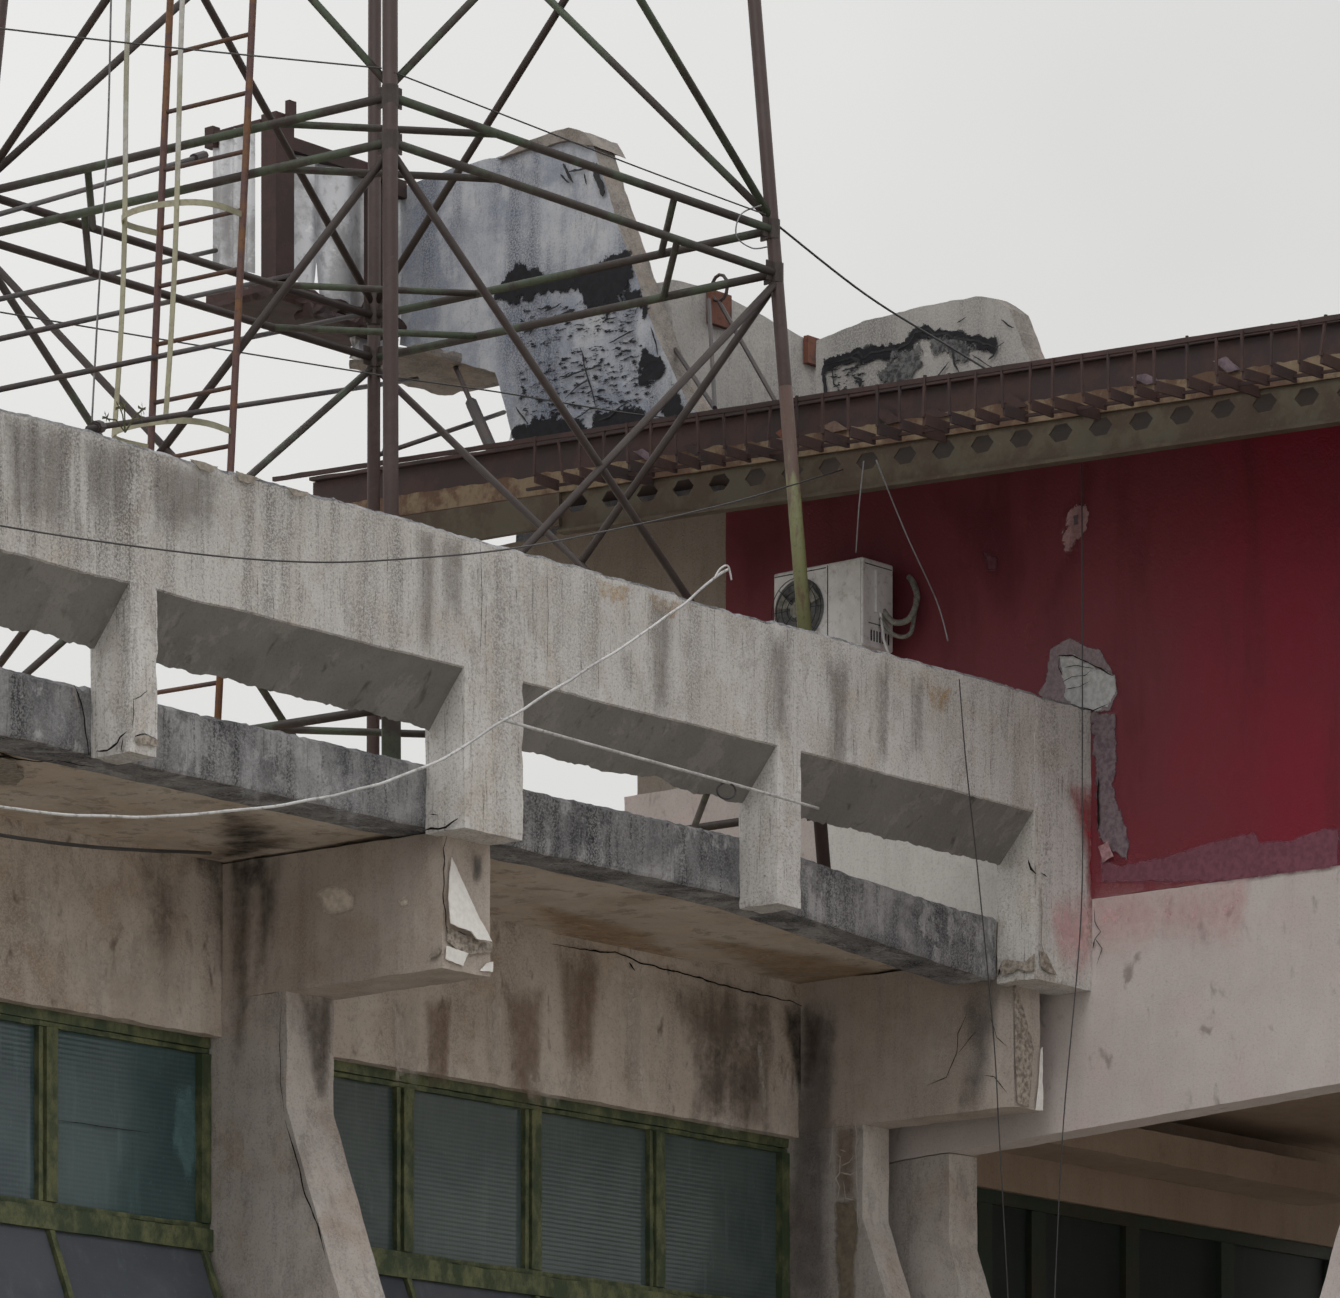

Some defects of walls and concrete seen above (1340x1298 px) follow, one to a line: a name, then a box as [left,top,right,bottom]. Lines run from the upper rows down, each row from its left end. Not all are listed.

peeling [1062,504,1089,553]
peeling [1038,638,1340,882]
leakage [224,816,281,872]
peeling [429,857,493,972]
crack [554,944,802,1006]
crack [929,1014,973,1085]
crack [279,1010,326,1258]